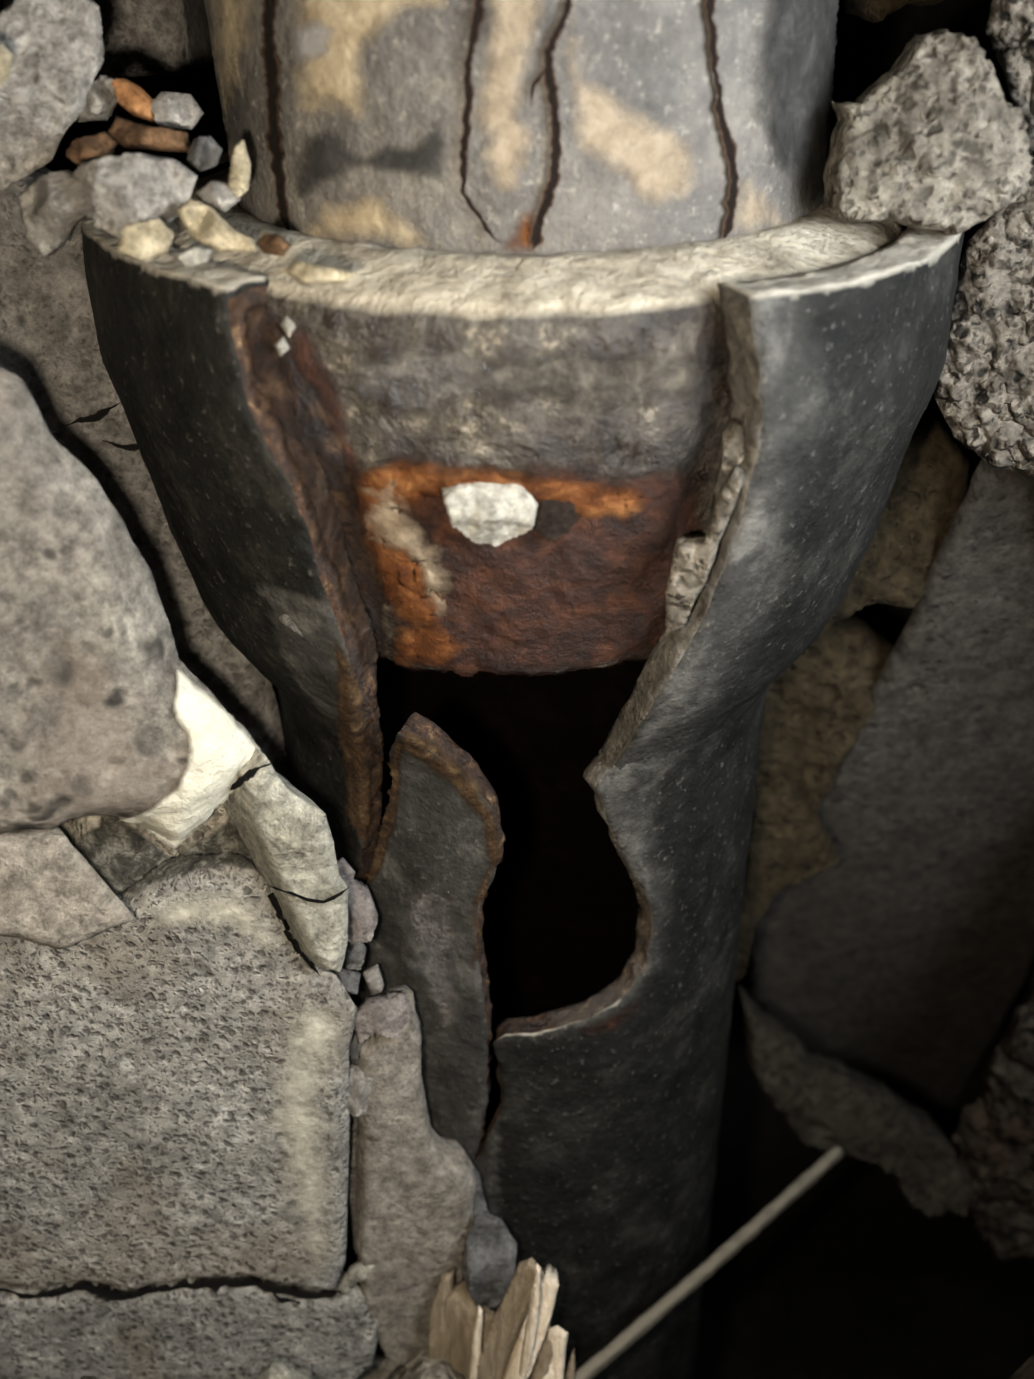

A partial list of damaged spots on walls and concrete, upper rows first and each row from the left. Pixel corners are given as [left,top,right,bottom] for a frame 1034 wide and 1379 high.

crack [260,0,290,230]
crack [459,0,573,251]
crack [703,0,739,238]
corrosion [247,305,700,970]
crack [0,1275,341,1305]